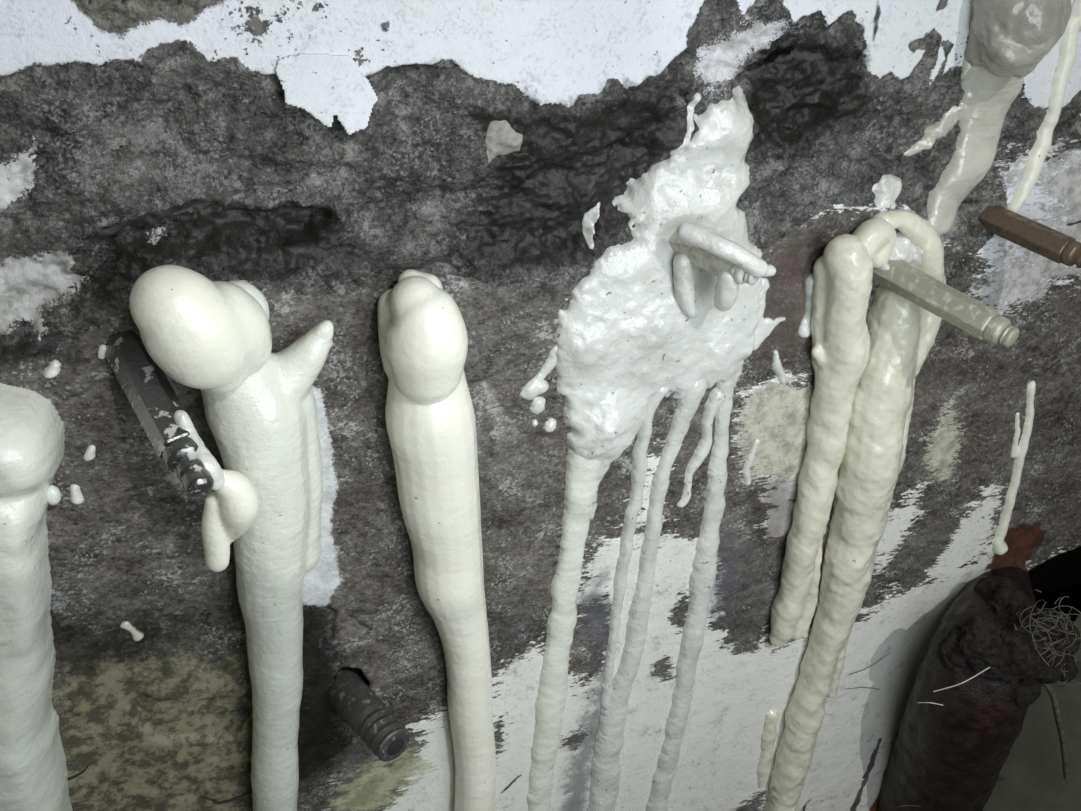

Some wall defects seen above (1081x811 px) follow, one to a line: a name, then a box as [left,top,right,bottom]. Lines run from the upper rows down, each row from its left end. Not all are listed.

spalling [222,0,303,65]
peeling [855,81,1081,623]
peeling [164,372,225,470]
peeling [658,383,717,548]
peeling [568,392,677,699]
peeling [818,503,834,598]
corrosion [985,521,1046,572]
peeling [668,589,689,635]
peeling [491,658,515,678]
peeling [493,712,513,759]
peeling [297,736,430,811]
peeling [850,738,882,811]